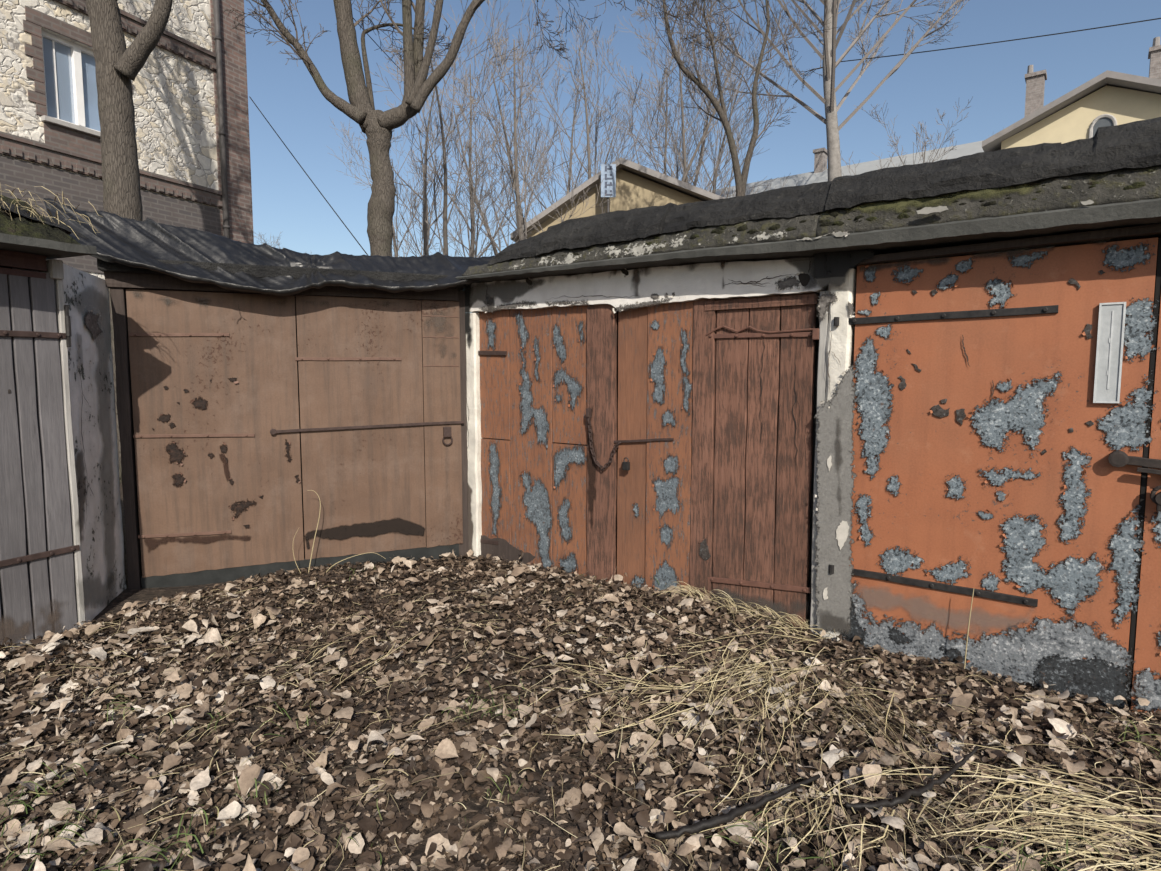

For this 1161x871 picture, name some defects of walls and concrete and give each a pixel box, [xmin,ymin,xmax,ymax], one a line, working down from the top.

spalling [772,272,810,291]
spalling [816,264,881,322]
corrosion [157,414,188,488]
corrosion [188,396,208,410]
corrosion [208,442,234,485]
peeling [480,299,590,574]
peeling [648,326,692,428]
peeling [1086,297,1160,456]
corrosion [144,495,263,551]
corrosion [305,518,425,549]
peeling [630,454,682,591]
peeling [813,324,1161,713]